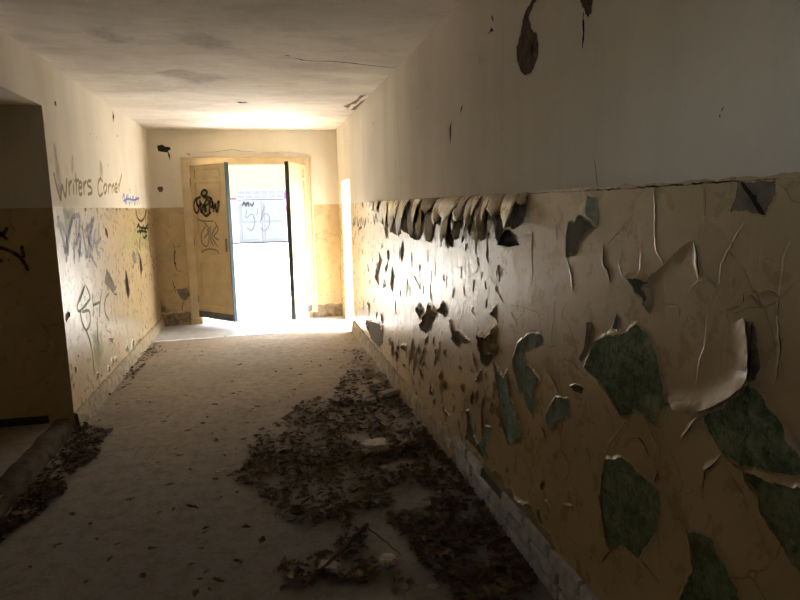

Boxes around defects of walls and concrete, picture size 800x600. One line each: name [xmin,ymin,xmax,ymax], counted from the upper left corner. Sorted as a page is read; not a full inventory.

flaking render [516,0,539,77]
hole [156,143,172,161]
crack [527,232,535,286]
peeling [564,192,600,259]
crack [530,160,800,292]
crack [695,239,791,384]
peeling [728,177,779,219]
peeling [362,192,584,561]
peeling [582,310,670,428]
peeling [699,319,800,577]
peeling [598,453,663,562]
peeling [676,526,743,600]